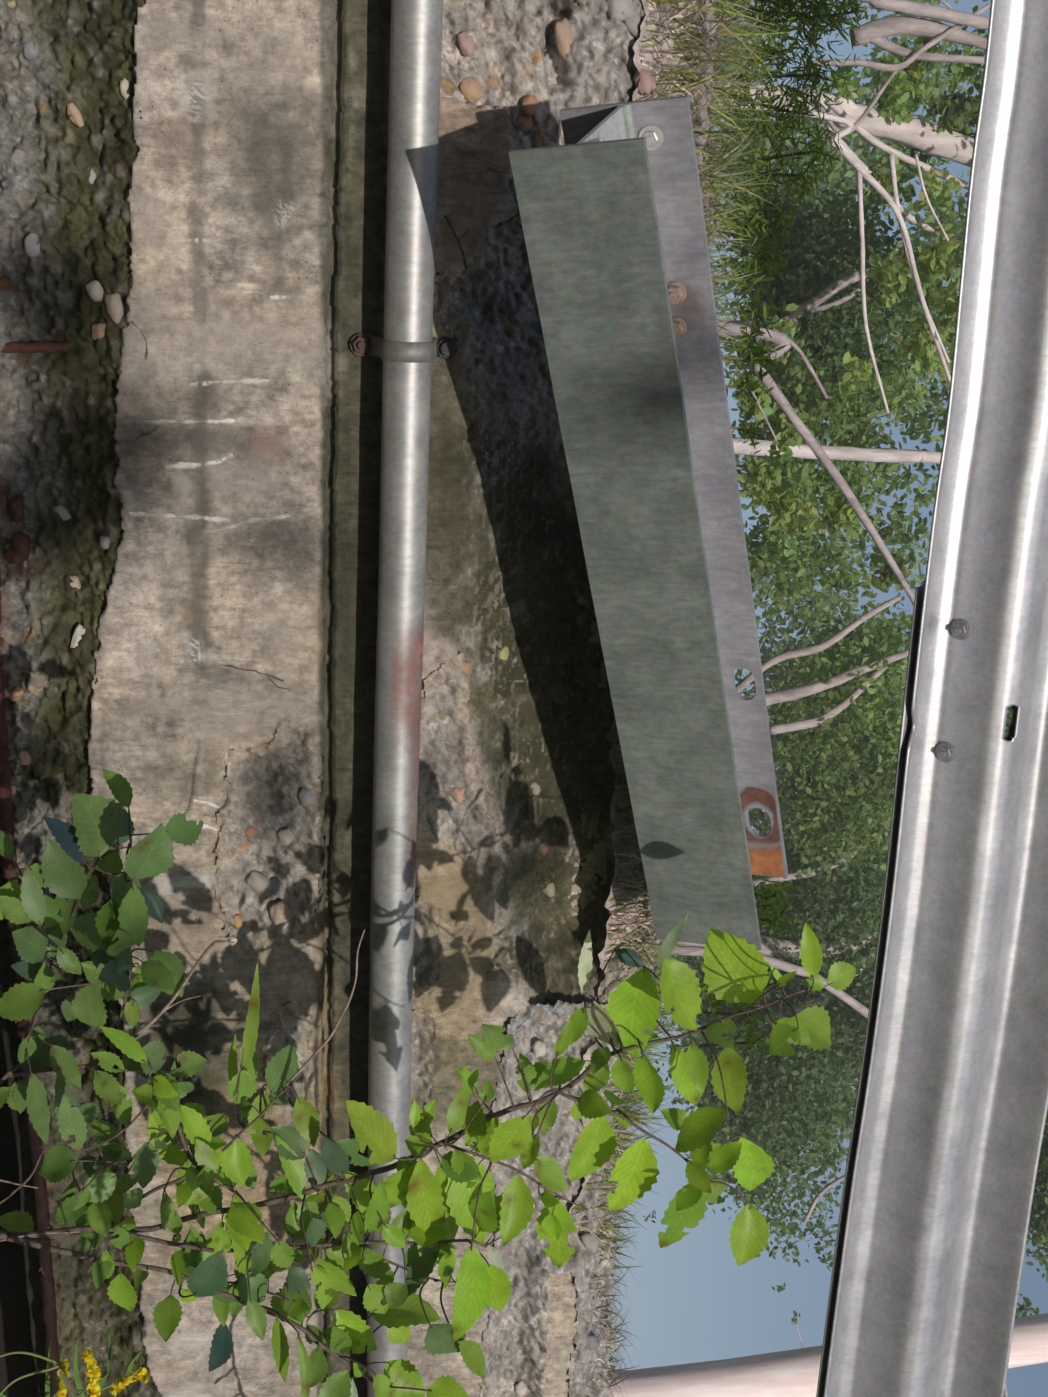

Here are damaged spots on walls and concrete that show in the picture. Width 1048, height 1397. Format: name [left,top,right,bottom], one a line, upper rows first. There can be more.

spalling [440,0,718,171]
rust [1,342,68,362]
spalling [0,0,152,887]
rust [0,489,33,885]
rust [7,919,27,987]
spalling [207,686,329,955]
leakage [428,880,476,910]
spalling [418,169,629,1397]
leakage [472,442,613,821]
spalling [633,856,660,951]
rust [25,1107,60,1397]
spalling [15,855,162,1397]